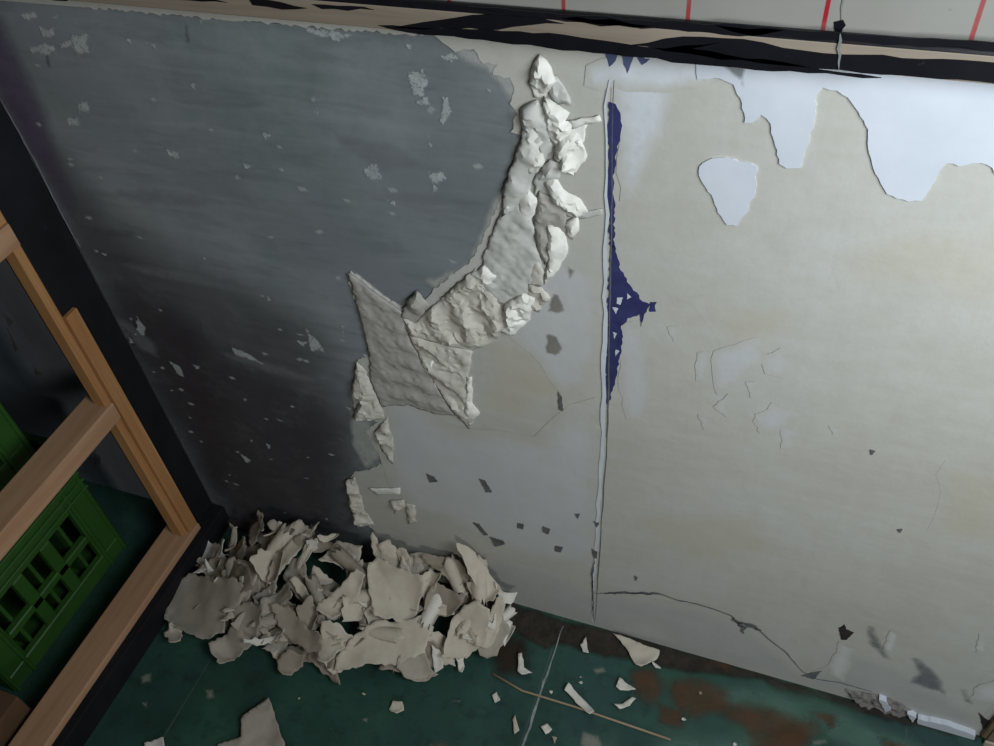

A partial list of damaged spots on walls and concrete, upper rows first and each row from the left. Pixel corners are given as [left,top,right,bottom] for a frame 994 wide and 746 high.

peeling [0,0,603,558]
peeling [699,157,758,226]
crack [591,80,872,692]
peeling [696,65,994,202]